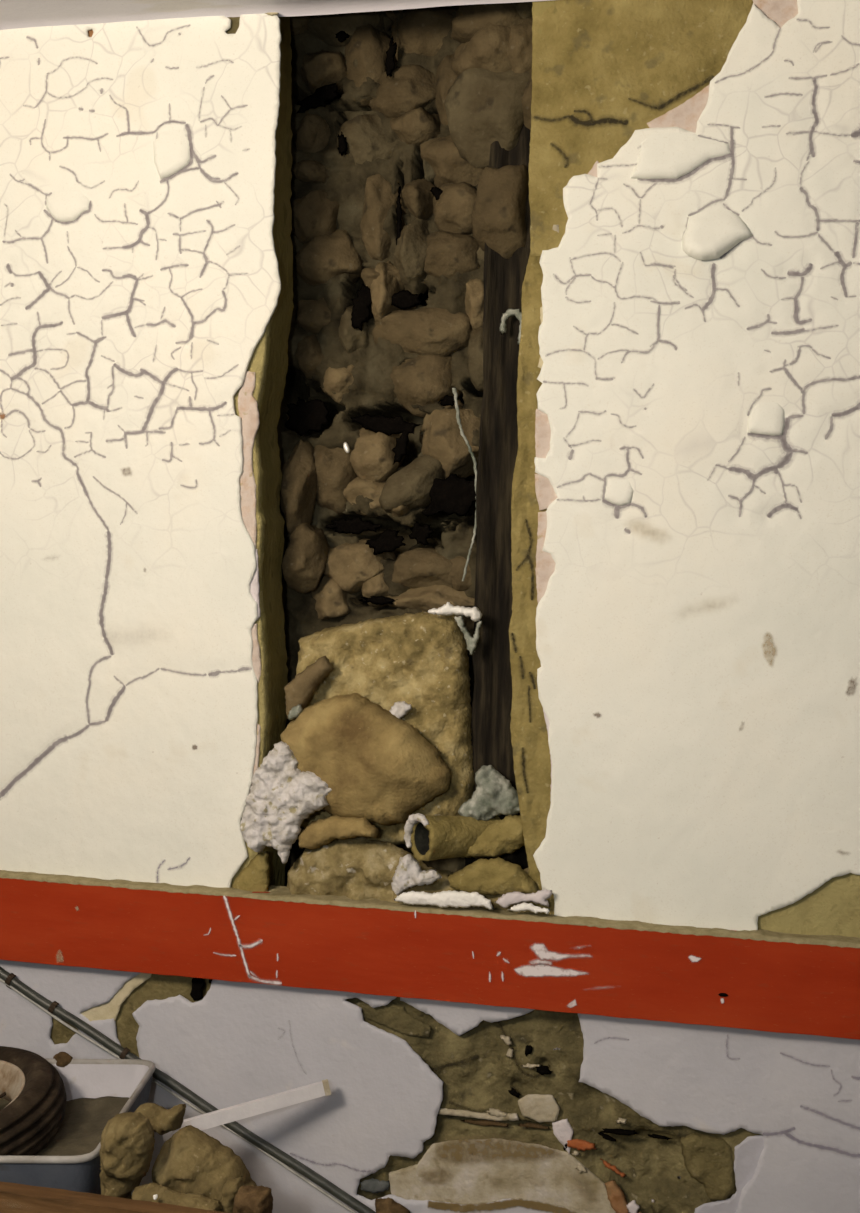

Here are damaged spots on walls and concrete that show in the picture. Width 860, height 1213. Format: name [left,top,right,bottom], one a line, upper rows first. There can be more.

crack [534,19,860,534]
crack [0,25,252,797]
flaking render [234,304,278,793]
flaking render [394,0,798,914]
flaking render [389,701,412,719]
flaking render [231,842,264,886]
spalling [757,873,860,938]
flaking render [50,973,213,1058]
flaking render [346,997,764,1213]
crack [763,1053,860,1157]